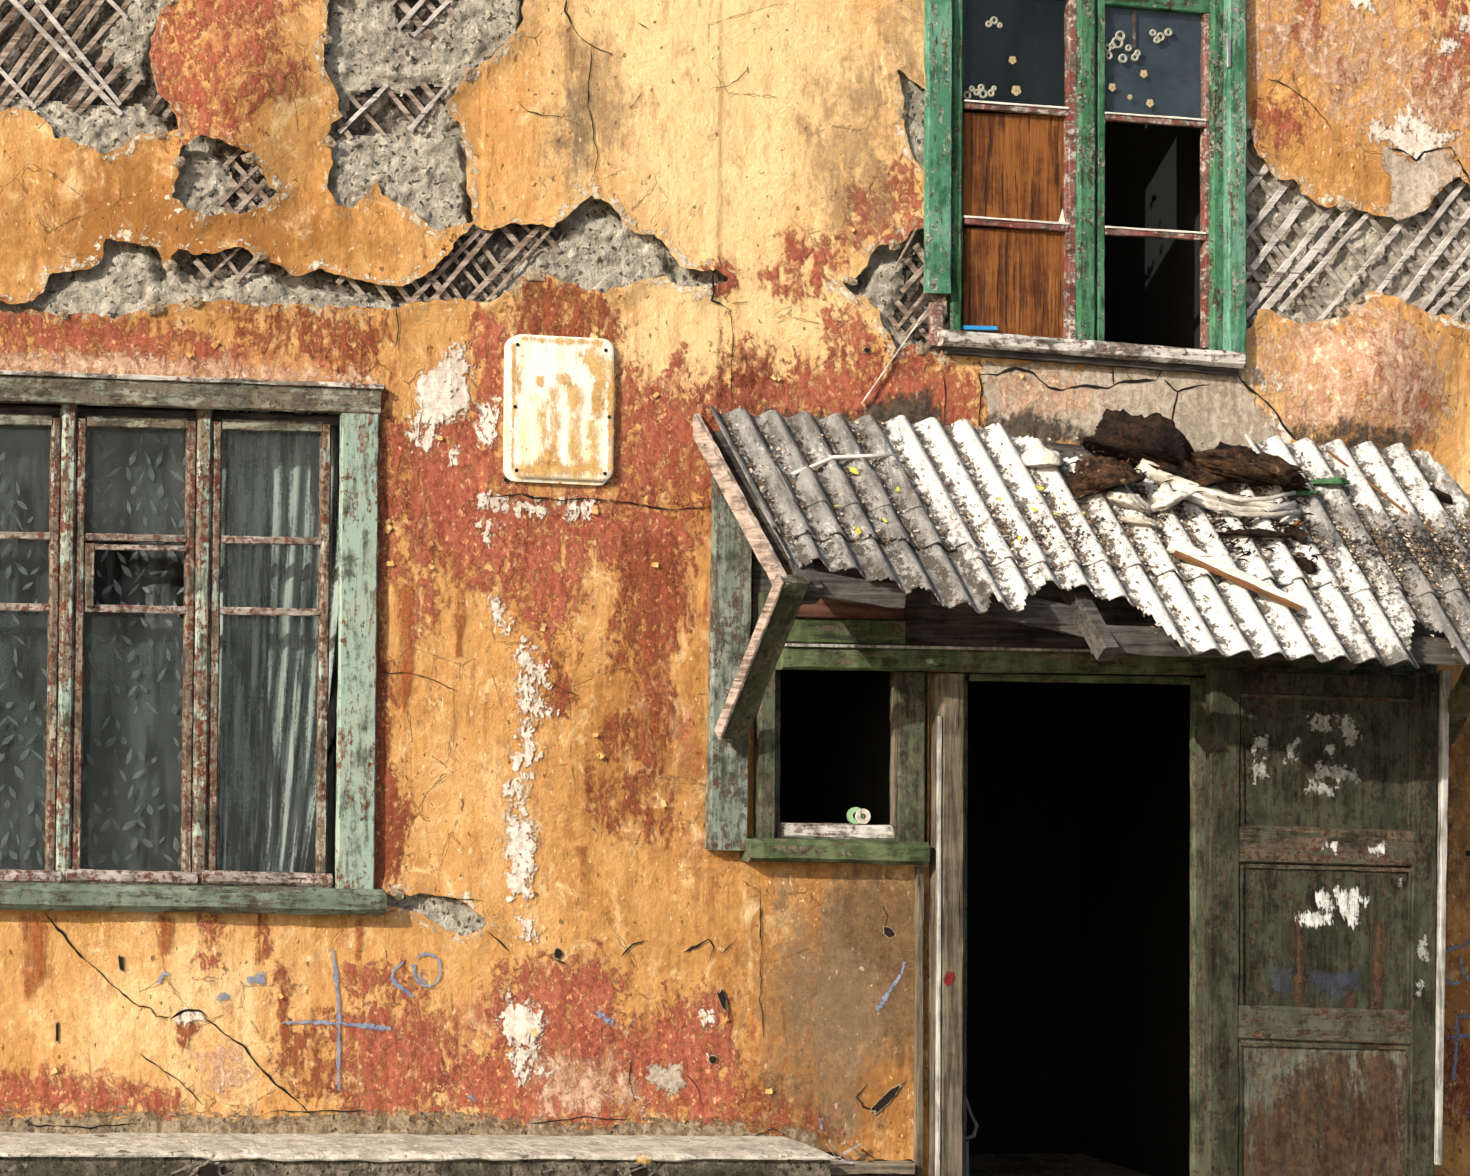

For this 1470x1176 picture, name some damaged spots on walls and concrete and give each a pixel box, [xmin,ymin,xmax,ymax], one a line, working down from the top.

flaking render [0,0,311,225]
peeling [662,341,692,381]
rust [510,336,614,478]
crack [944,367,1297,441]
spalling [1428,488,1453,505]
peeling [190,913,227,978]
peeling [254,914,275,963]
peeling [513,908,543,945]
crack [45,914,367,1117]
flaking render [0,938,846,1152]
crack [31,1122,143,1130]
crack [530,1064,635,1124]